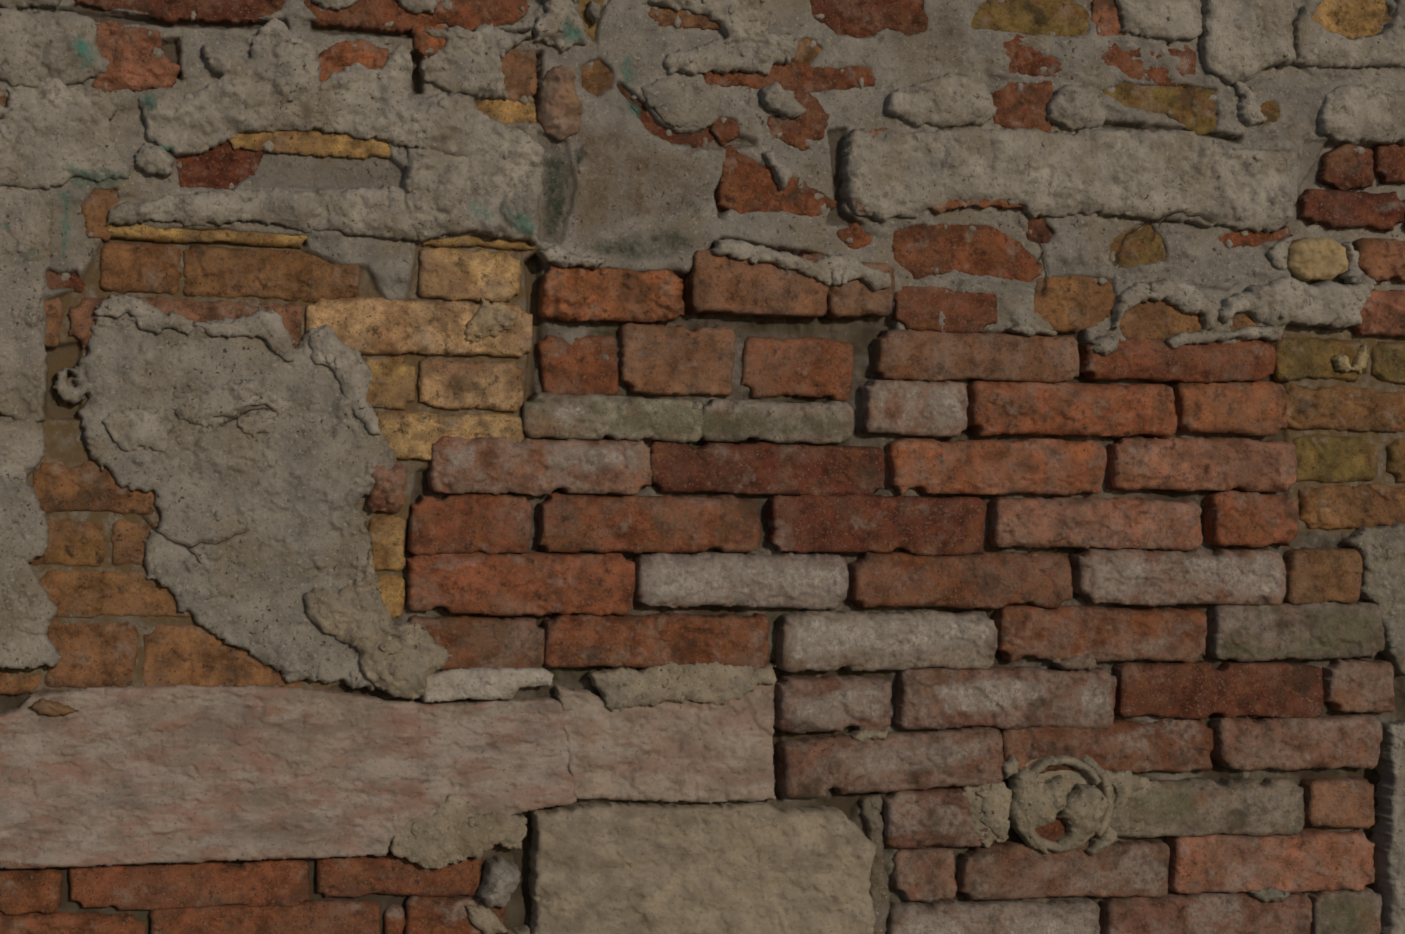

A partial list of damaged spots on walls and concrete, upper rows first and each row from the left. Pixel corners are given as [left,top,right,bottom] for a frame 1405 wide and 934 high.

crack [1116,211,1214,266]
peeling [0,0,1405,700]
crack [213,408,277,426]
crack [141,515,246,564]
spalling [30,698,79,716]
peeling [587,661,777,712]